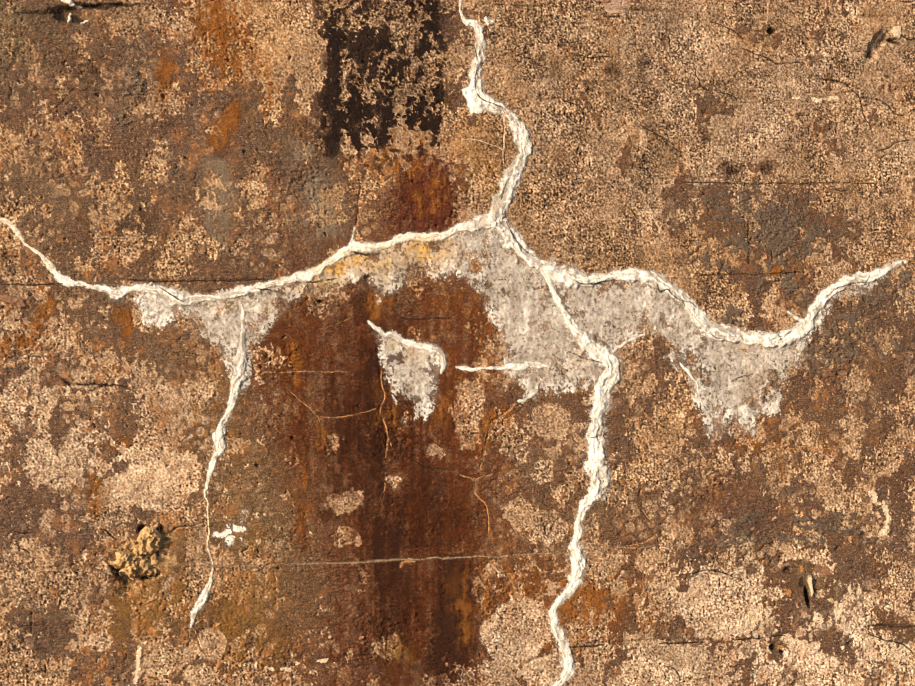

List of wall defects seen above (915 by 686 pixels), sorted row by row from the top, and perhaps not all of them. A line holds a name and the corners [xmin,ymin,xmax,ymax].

crack [713,22,802,65]
crack [817,79,913,150]
crack [0,0,532,307]
rust [382,159,451,234]
crack [689,182,876,192]
rust [370,293,384,318]
leakage [134,229,884,439]
crack [63,380,127,388]
crack [245,370,516,534]
crack [489,216,907,686]
rust [544,577,606,621]
crack [864,624,915,657]